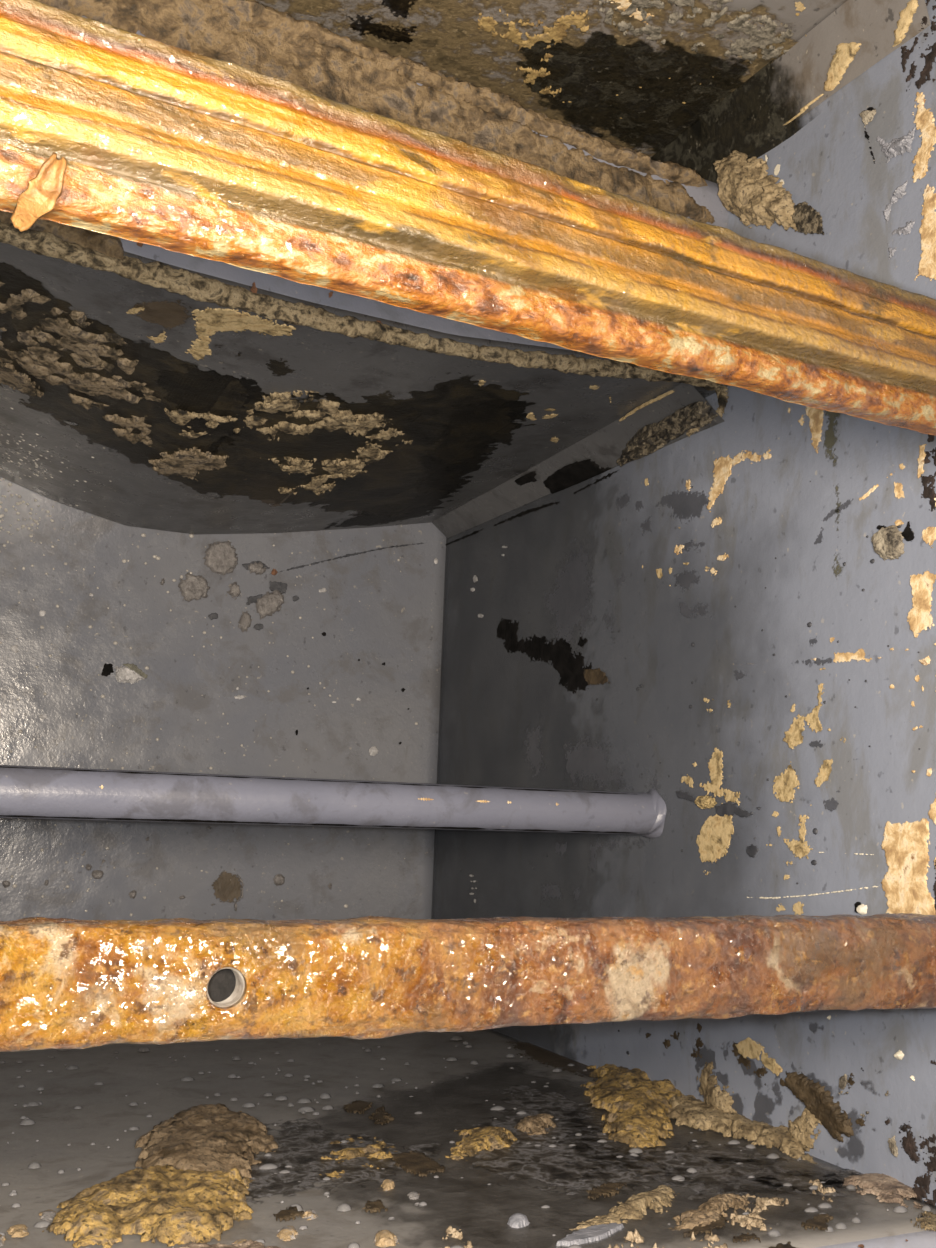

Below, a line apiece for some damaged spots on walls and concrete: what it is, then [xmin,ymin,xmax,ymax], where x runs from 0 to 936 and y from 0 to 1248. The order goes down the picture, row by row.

corrosion [10,152,67,232]
corrosion [256,0,798,158]
water stain [517,32,802,183]
peeling [876,0,936,281]
water stain [0,262,537,594]
corrosion [515,401,718,494]
peeling [766,571,936,880]
peeling [681,748,740,875]
peeling [881,794,936,915]
corrosion [731,1041,787,1087]
water stain [245,1037,864,1248]
peeling [885,1119,936,1206]